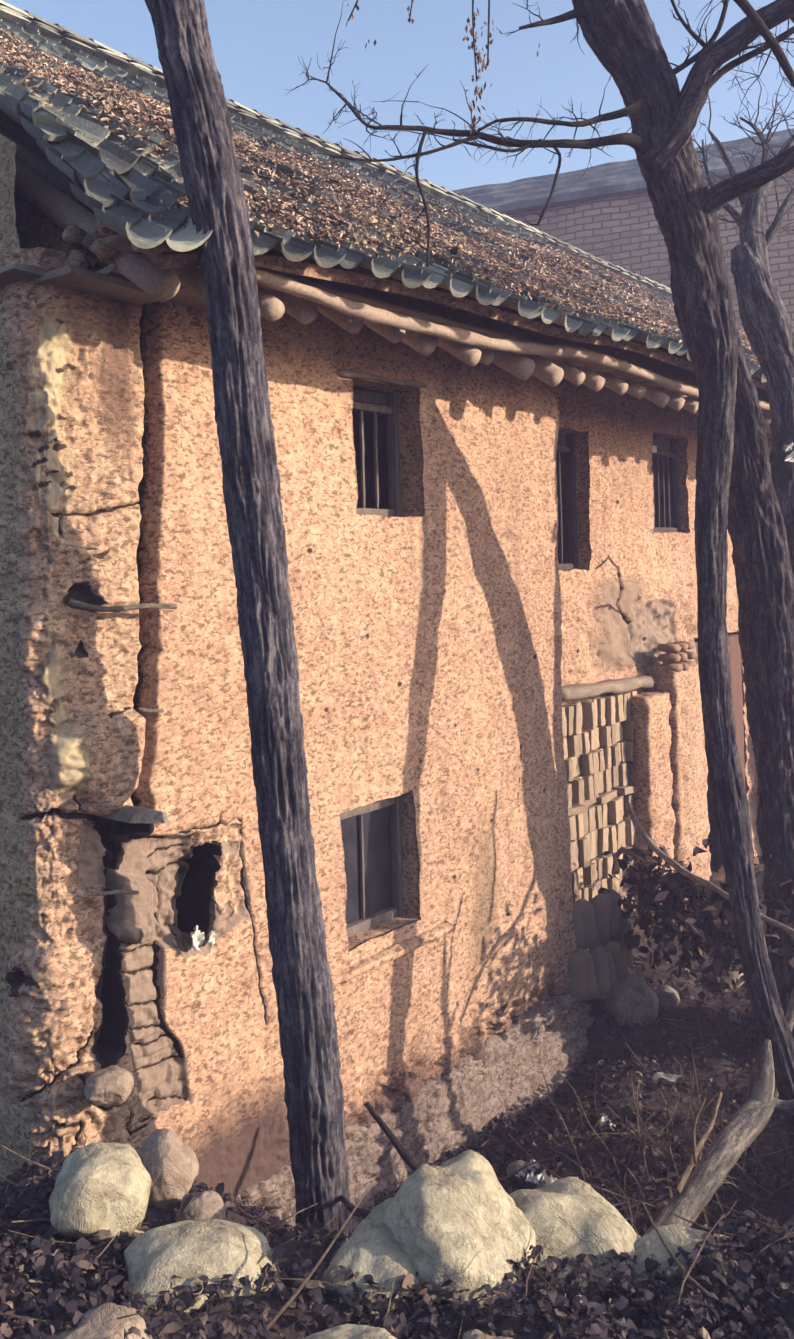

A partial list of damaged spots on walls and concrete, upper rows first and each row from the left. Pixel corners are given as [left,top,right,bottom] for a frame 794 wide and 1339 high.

spalling [62,582,108,612]
crack [51,305,150,718]
flaking render [628,596,677,674]
crack [19,792,267,1155]
spalling [87,818,252,1115]
spalling [475,998,526,1052]